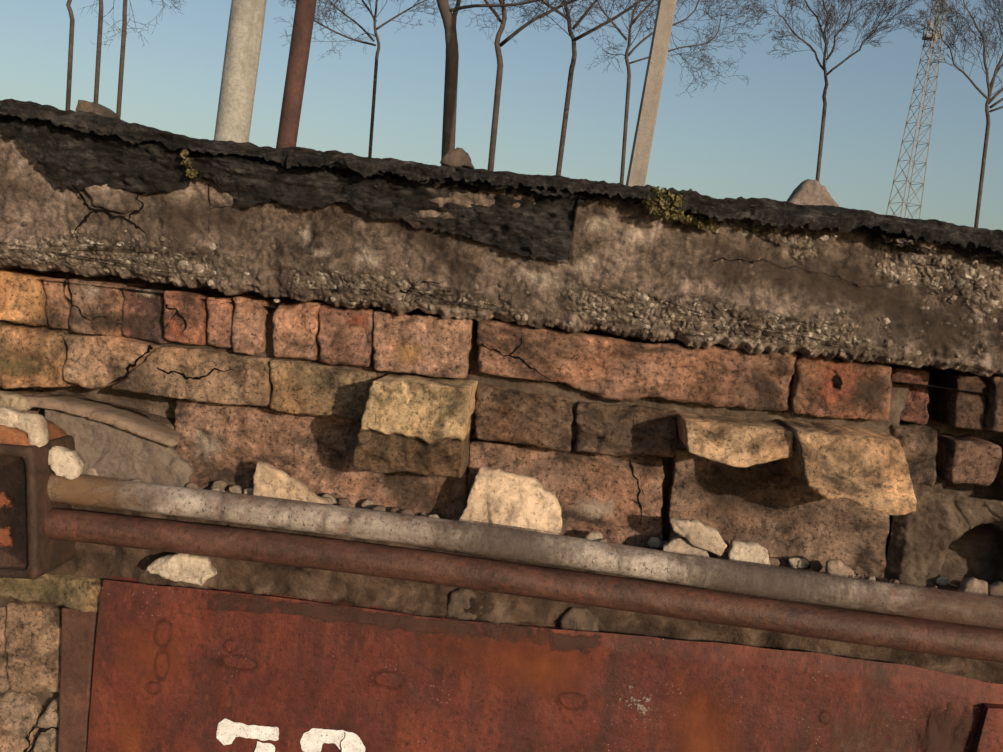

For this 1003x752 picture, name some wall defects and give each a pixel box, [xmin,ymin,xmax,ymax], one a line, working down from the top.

crack [71,185,147,240]
crack [104,304,232,389]
crack [630,460,642,530]
rust [909,588,1003,631]
crack [23,726,59,752]